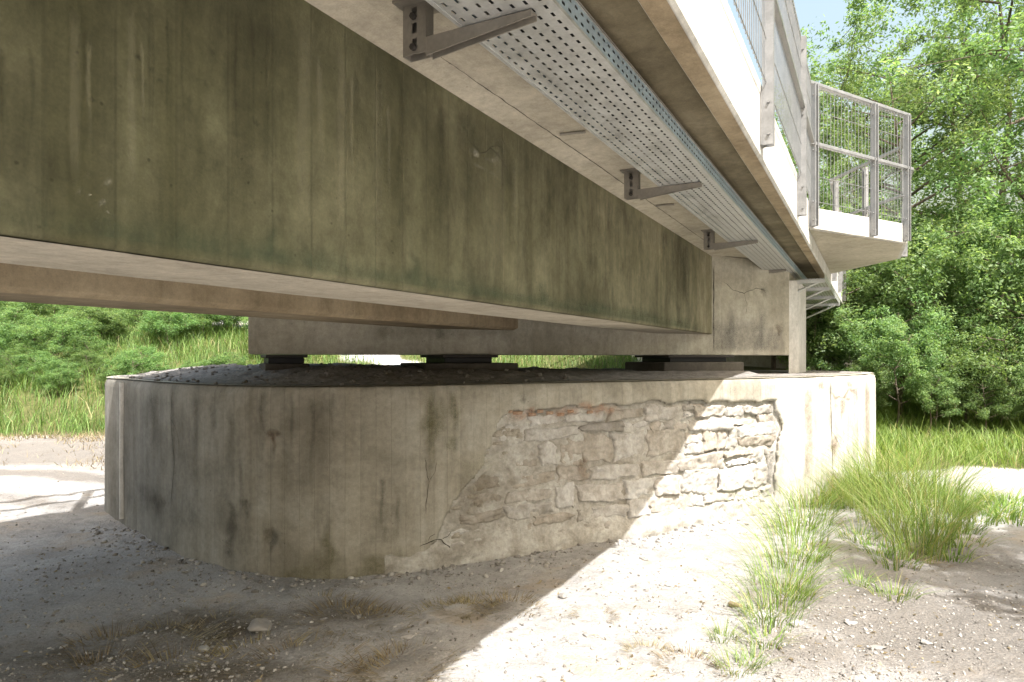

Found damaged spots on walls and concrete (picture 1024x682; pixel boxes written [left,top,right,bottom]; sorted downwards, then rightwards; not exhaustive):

crack [713,281,762,340]
spalling [384,400,794,575]